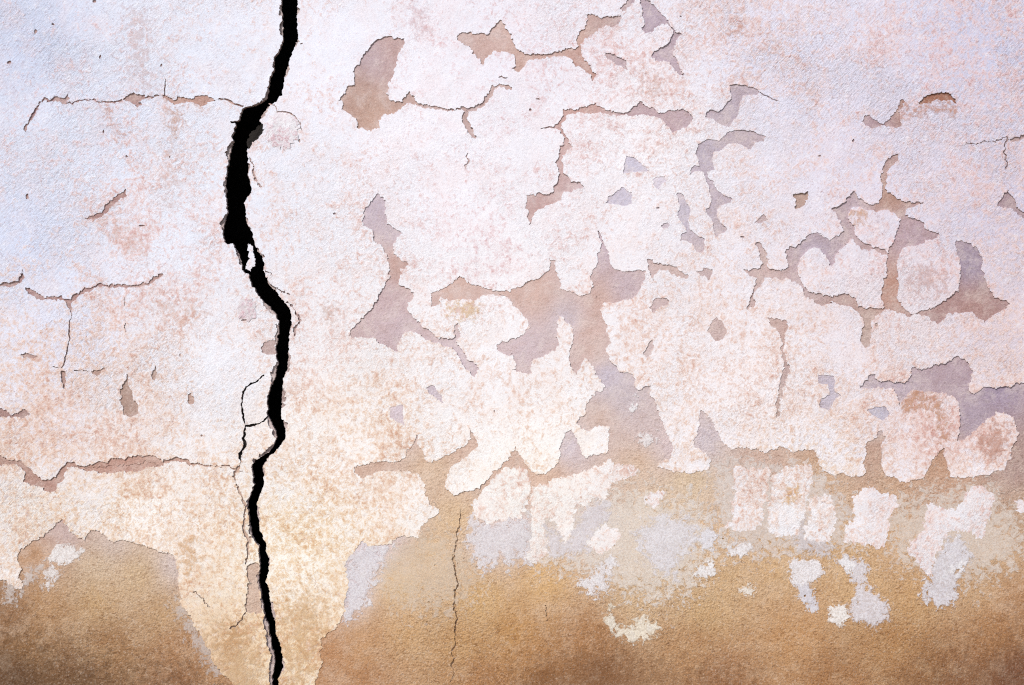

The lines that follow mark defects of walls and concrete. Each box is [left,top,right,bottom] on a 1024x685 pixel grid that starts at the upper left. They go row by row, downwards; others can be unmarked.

crack [0,0,302,685]
flaking render [350,193,479,377]
flaking render [338,0,684,139]
flaking render [525,84,779,253]
flaking render [740,154,1010,348]
peeling [862,99,905,129]
peeling [997,190,1024,218]
flaking render [315,231,1024,685]